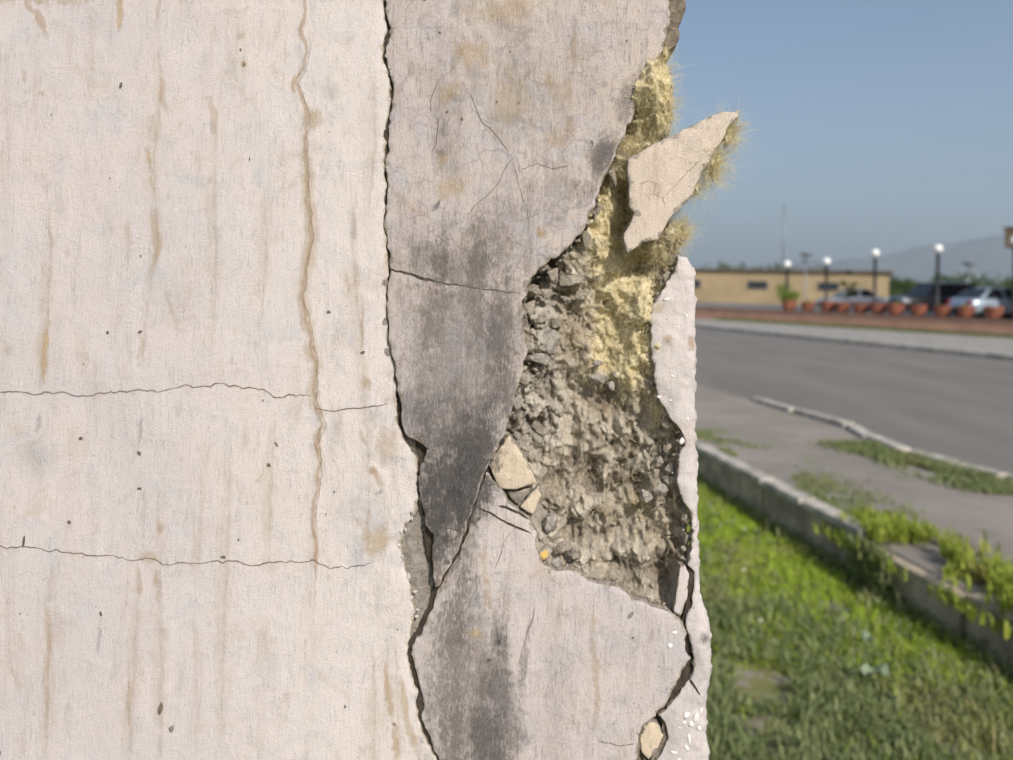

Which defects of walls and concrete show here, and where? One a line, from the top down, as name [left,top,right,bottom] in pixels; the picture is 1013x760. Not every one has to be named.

crack [0,359,530,760]
crack [383,1,519,333]
damp [414,278,520,577]
crack [471,96,566,221]
flaking render [489,30,763,620]
crack [599,564,700,760]